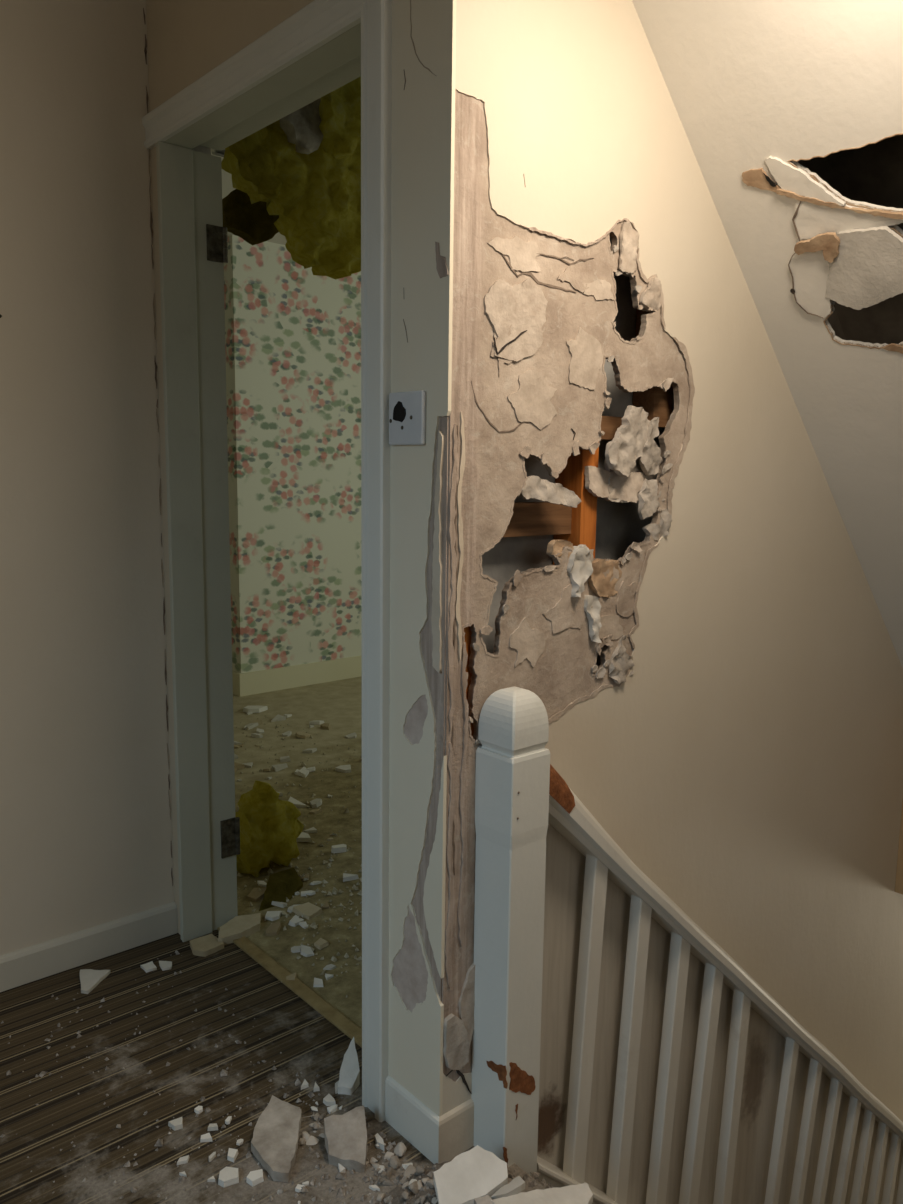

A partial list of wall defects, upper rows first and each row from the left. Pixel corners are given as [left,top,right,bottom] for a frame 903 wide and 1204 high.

crack [404,0,436,89]
spalling [391,89,695,1119]